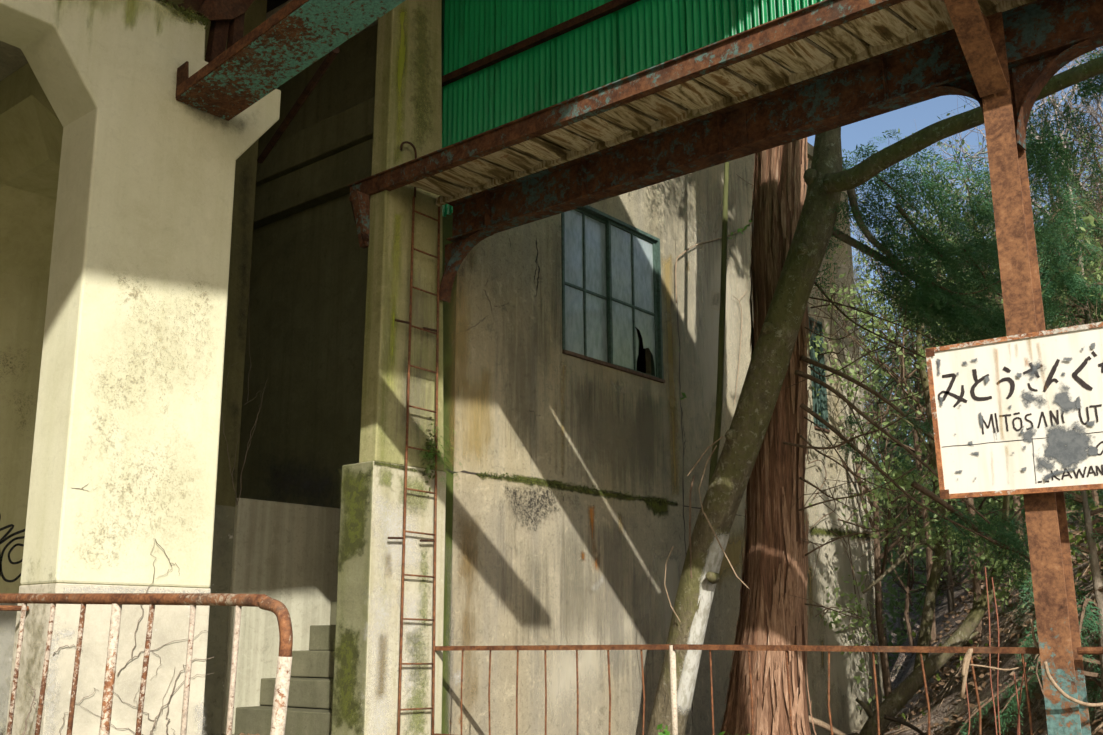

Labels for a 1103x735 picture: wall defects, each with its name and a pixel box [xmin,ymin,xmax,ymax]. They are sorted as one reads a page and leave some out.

water stain [664,258,677,491]
water stain [505,487,564,529]
water stain [551,596,649,706]
water stain [656,558,679,644]